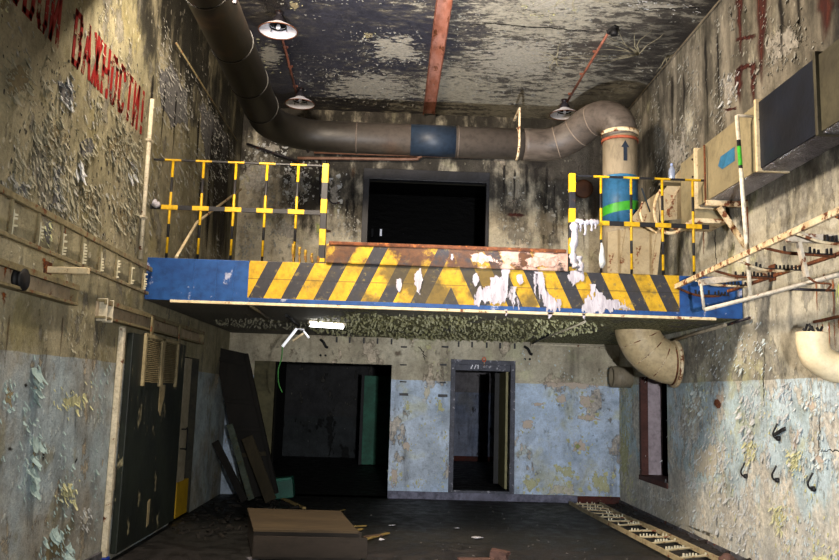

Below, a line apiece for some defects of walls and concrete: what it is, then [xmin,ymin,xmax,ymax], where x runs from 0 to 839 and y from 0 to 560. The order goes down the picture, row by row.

damp [522,28,664,71]
corrosion [813,315,839,343]
peeling [1,291,112,511]
peeling [39,432,98,560]
peeling [517,308,839,560]